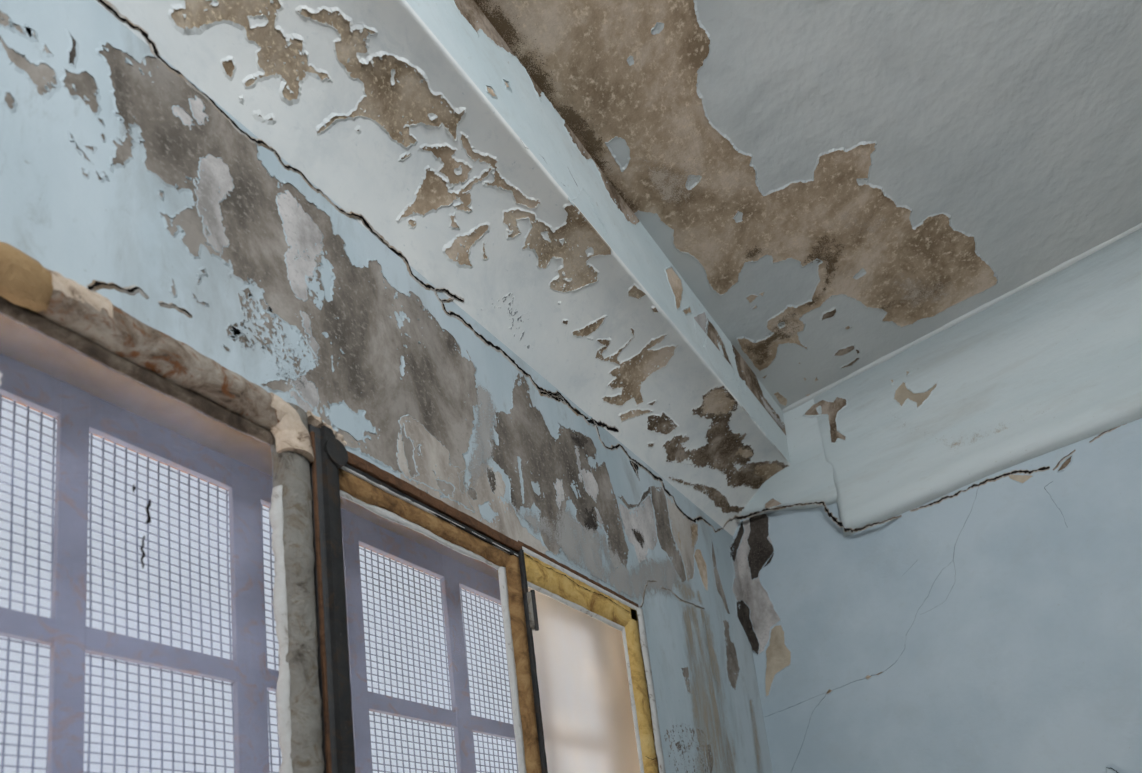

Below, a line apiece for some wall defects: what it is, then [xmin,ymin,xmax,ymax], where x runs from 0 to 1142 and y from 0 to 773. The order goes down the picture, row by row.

peeling [0,0,792,773]
crack [86,0,1076,566]
crack [525,554,705,767]
peeling [452,0,998,491]
crack [1089,418,1141,443]